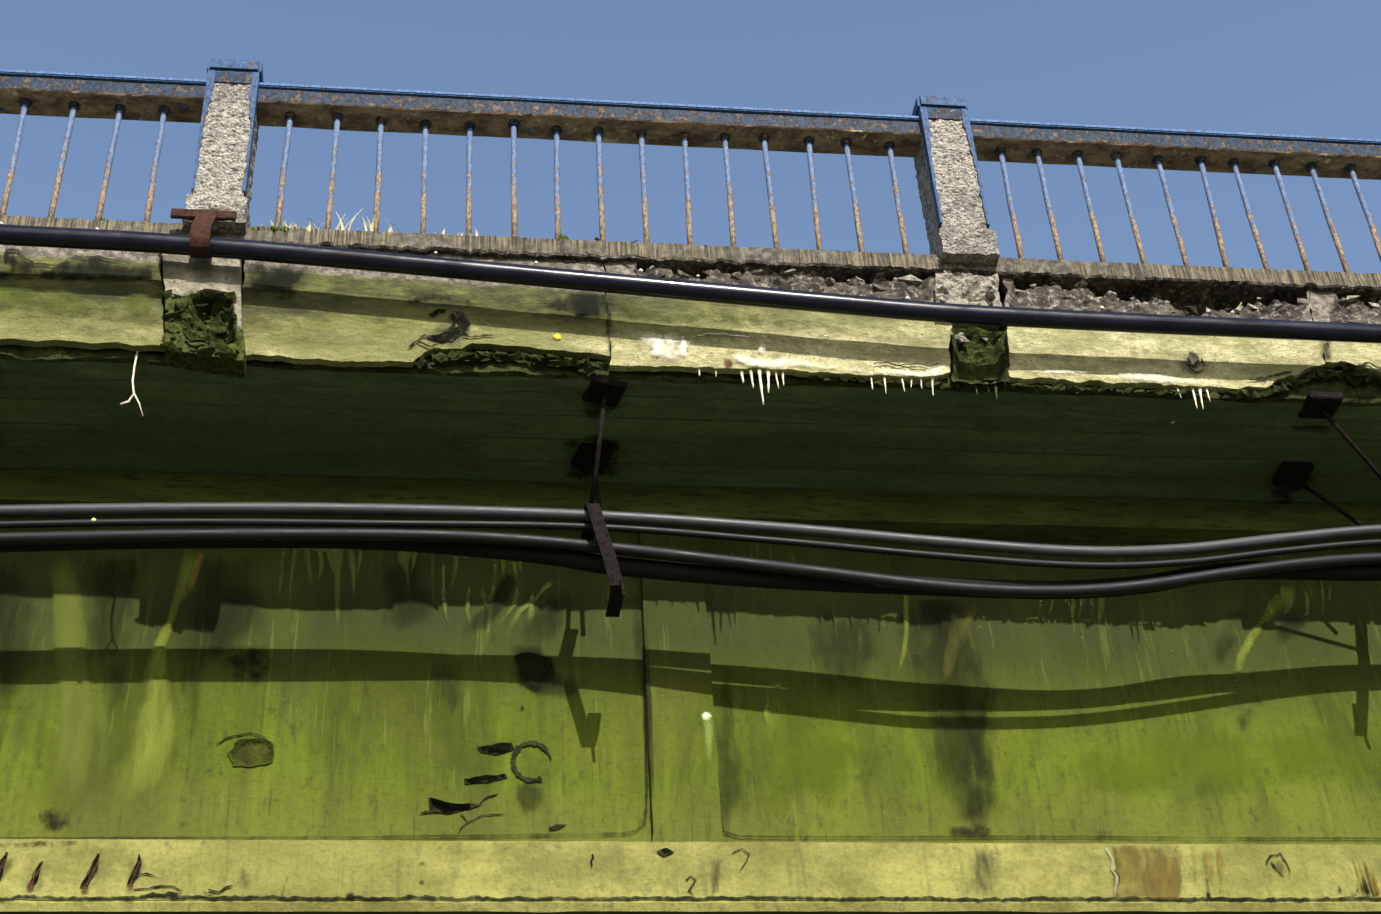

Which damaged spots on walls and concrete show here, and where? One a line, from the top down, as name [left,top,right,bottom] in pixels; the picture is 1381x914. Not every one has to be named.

spalling [634,258,1312,321]
spalling [0,271,1381,430]
crack [1248,371,1292,380]
crack [1345,361,1381,369]
damp [280,548,361,600]
damp [466,560,551,633]
damp [232,648,267,680]
damp [519,648,568,690]
crack [0,848,1381,902]